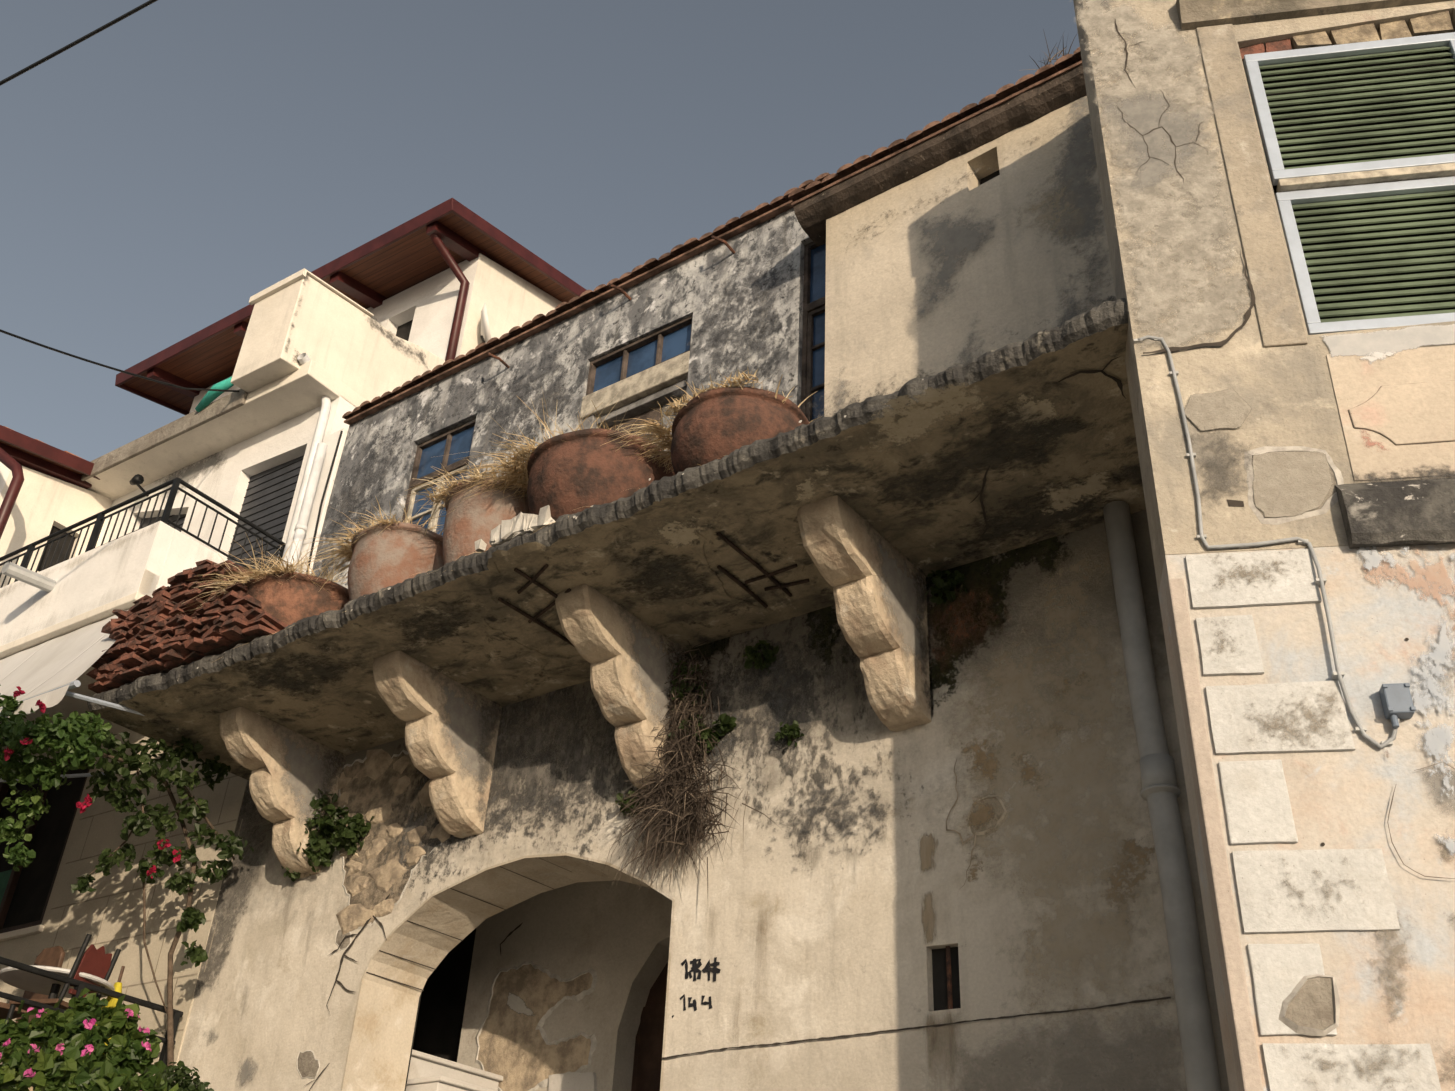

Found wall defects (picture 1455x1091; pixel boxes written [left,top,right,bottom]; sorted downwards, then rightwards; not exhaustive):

crack [1115,19,1208,183]
leakage [675,233,799,394]
leakage [453,346,590,471]
leakage [854,405,1124,560]
flaking render [333,749,451,951]
leakage [375,685,656,898]
spalling [478,542,596,662]
spalling [649,515,827,615]
leakage [667,612,899,858]
peeling [1358,547,1455,799]
spalling [475,961,598,1091]
spalling [1278,974,1340,1036]